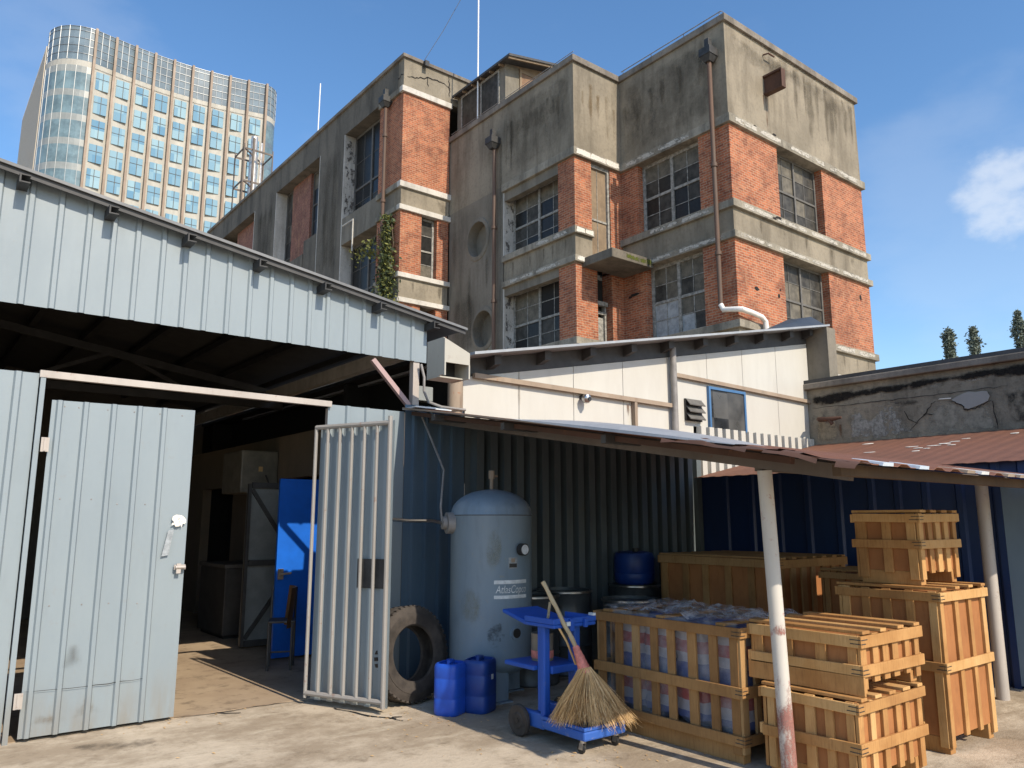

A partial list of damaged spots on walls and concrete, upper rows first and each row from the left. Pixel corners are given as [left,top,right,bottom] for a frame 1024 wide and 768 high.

crack [398,74,451,97]
crack [821,386,1000,431]
flaking render [909,379,993,452]
rust [660,438,874,469]